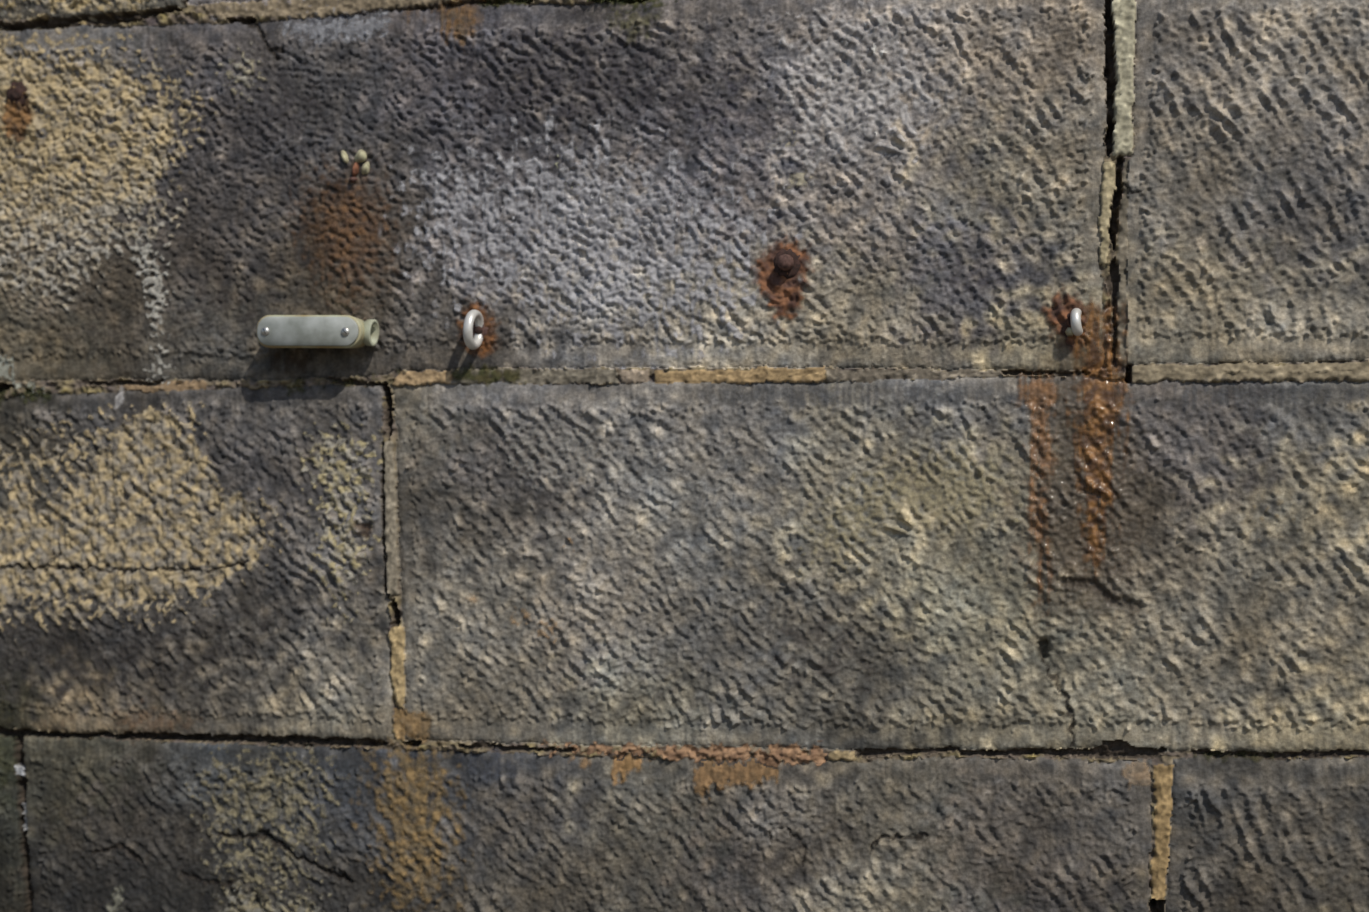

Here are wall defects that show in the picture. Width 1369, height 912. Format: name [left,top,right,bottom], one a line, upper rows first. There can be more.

rust [2,86,32,142]
rust [311,176,388,285]
rust [756,241,810,319]
rust [458,302,495,355]
rust [1019,293,1130,592]
crack [0,561,248,573]